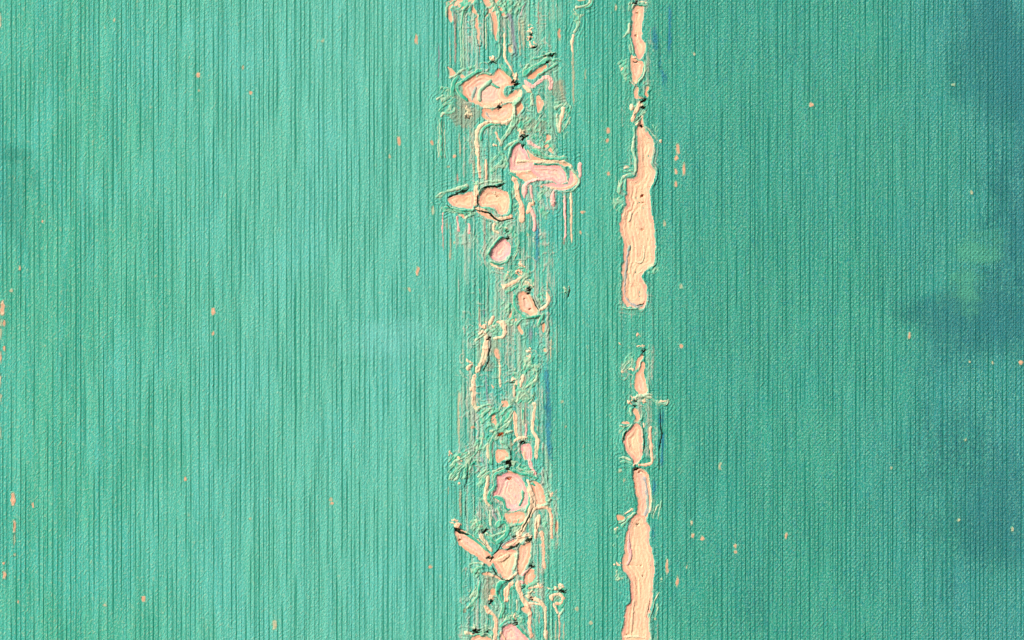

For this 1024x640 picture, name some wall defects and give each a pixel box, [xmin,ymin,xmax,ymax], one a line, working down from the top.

peeling [607,0,666,310]
peeling [430,0,586,640]
peeling [612,333,688,640]